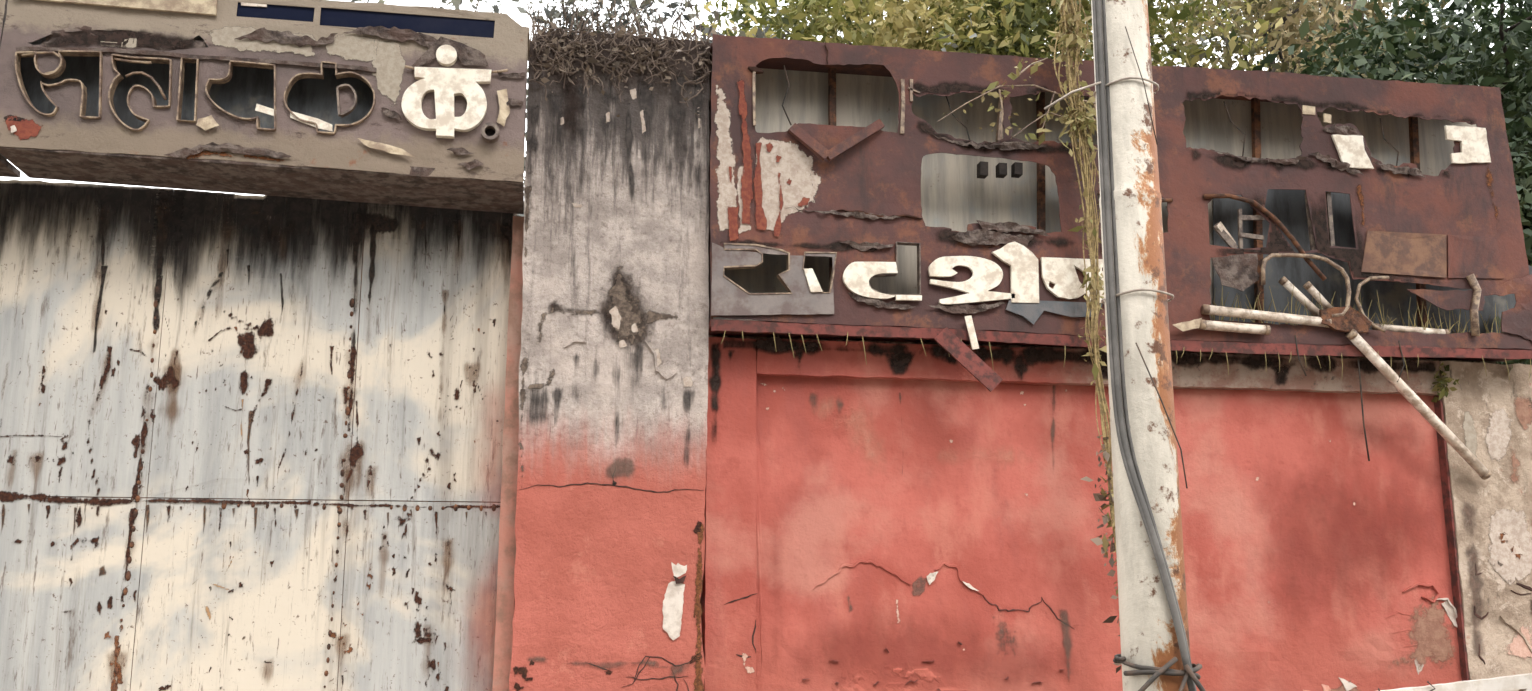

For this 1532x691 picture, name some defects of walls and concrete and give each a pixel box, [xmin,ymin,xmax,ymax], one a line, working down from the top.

leakage [529,74,703,199]
leakage [0,183,514,334]
leakage [121,412,148,602]
corrosion [0,214,500,691]
leakage [330,332,357,431]
crack [520,477,704,493]
leakage [111,635,119,691]
peeling [662,521,704,691]